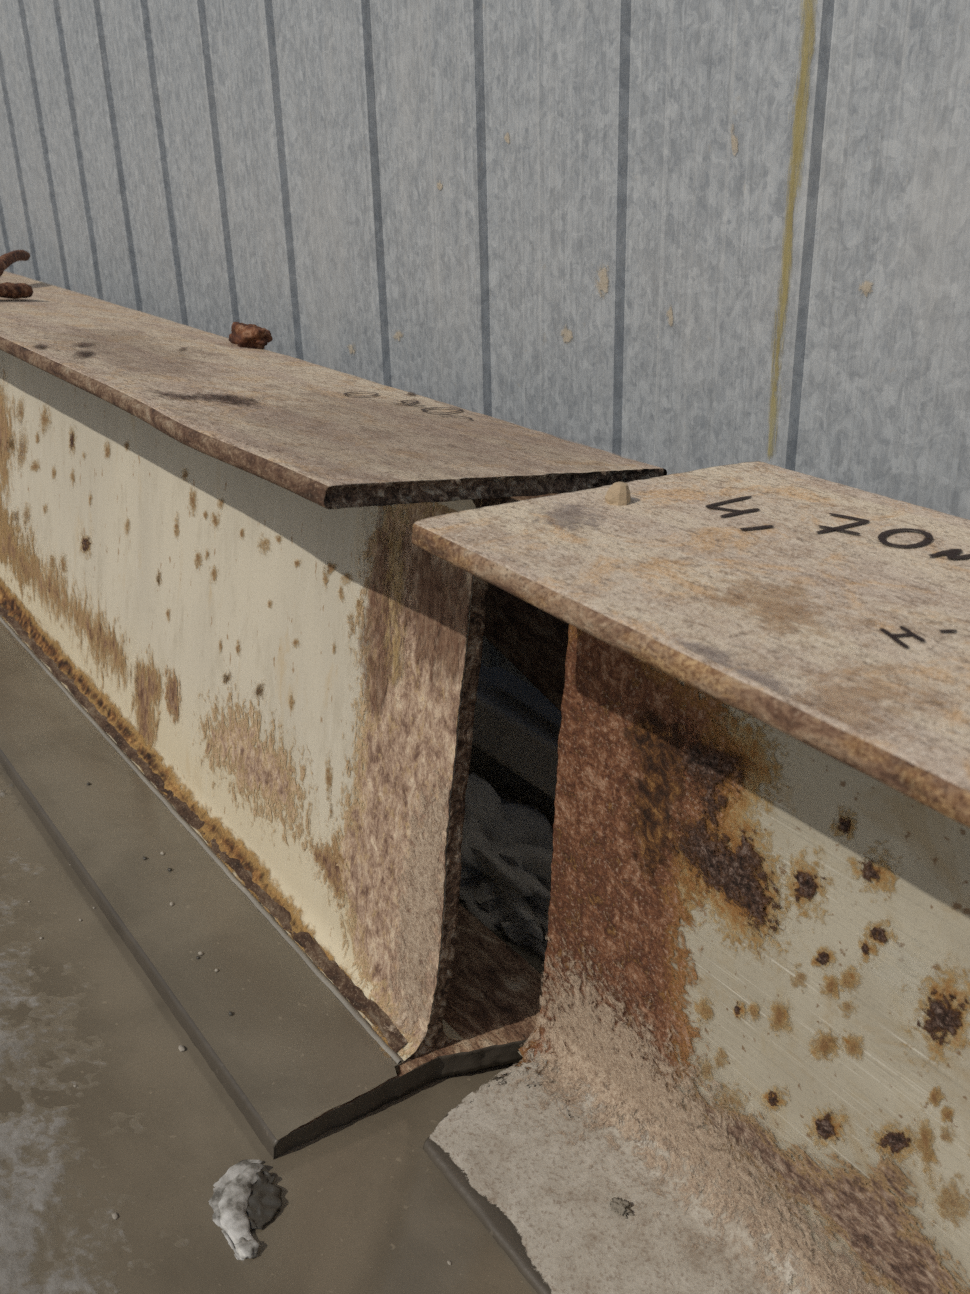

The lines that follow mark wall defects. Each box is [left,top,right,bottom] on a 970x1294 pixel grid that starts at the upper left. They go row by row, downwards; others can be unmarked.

corrosion [73,341,94,358]
leakage [768,0,814,455]
corrosion [0,370,473,1058]
corrosion [501,624,970,1294]